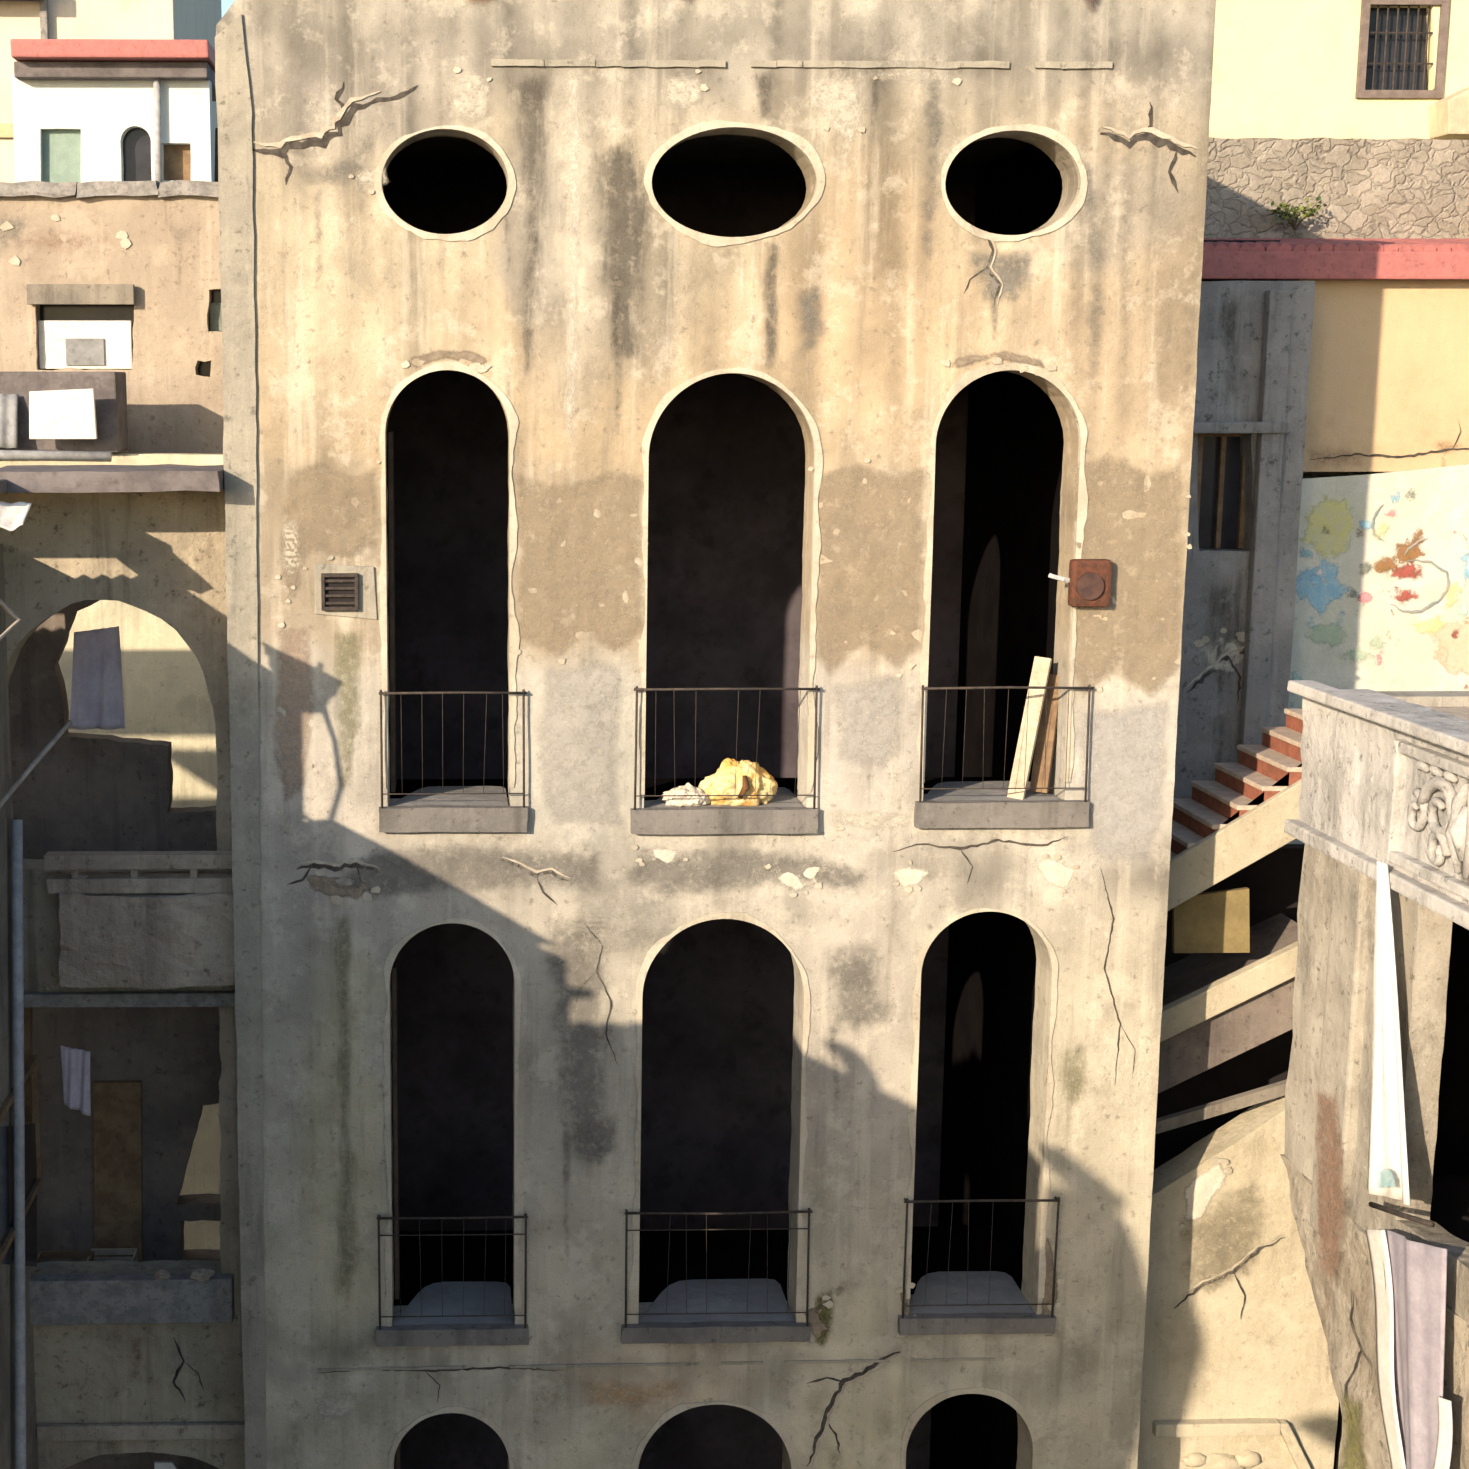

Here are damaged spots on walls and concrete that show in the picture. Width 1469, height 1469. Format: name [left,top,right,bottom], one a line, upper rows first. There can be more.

crack [252,82,418,185]
crack [1100,102,1198,192]
damp [603,148,645,355]
crack [963,231,1003,305]
crack [1310,424,1469,460]
spalling [309,870,381,905]
damp [832,958,883,1022]
crack [1101,871,1135,1081]
spalling [1179,1157,1233,1228]
crack [1171,1234,1286,1316]
crack [172,1338,204,1401]
crack [806,1351,901,1468]